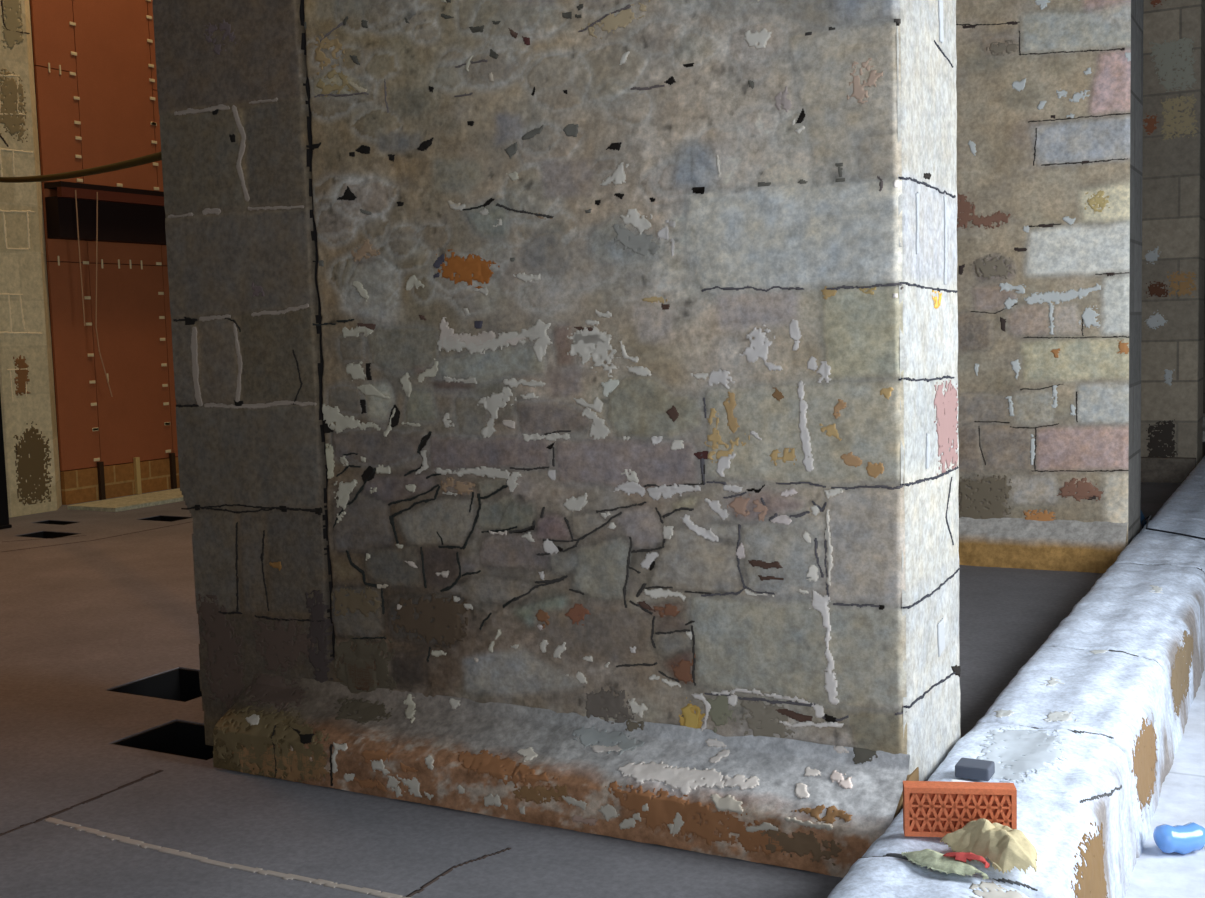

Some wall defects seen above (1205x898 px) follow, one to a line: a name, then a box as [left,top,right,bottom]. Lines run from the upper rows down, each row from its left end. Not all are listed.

damp [0,0,24,50]
crack [934,22,1122,68]
damp [0,68,28,143]
spalling [388,405,400,427]
damp [13,421,53,505]
spalling [361,466,375,482]
crack [181,384,1129,722]